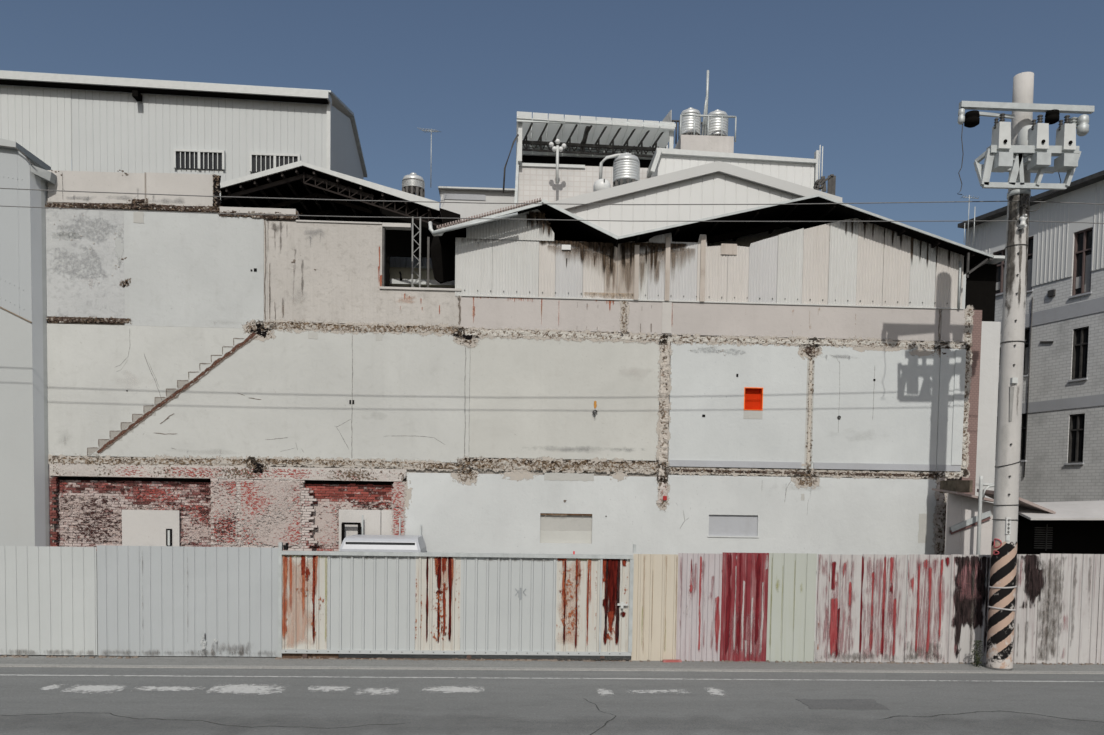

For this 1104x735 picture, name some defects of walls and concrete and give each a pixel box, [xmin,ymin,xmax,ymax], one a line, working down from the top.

damp [527,211,689,284]
spalling [46,296,974,659]
rust [282,555,324,644]
rust [415,556,459,642]
rust [557,558,628,648]
damp [953,556,990,658]
damp [1016,554,1065,660]